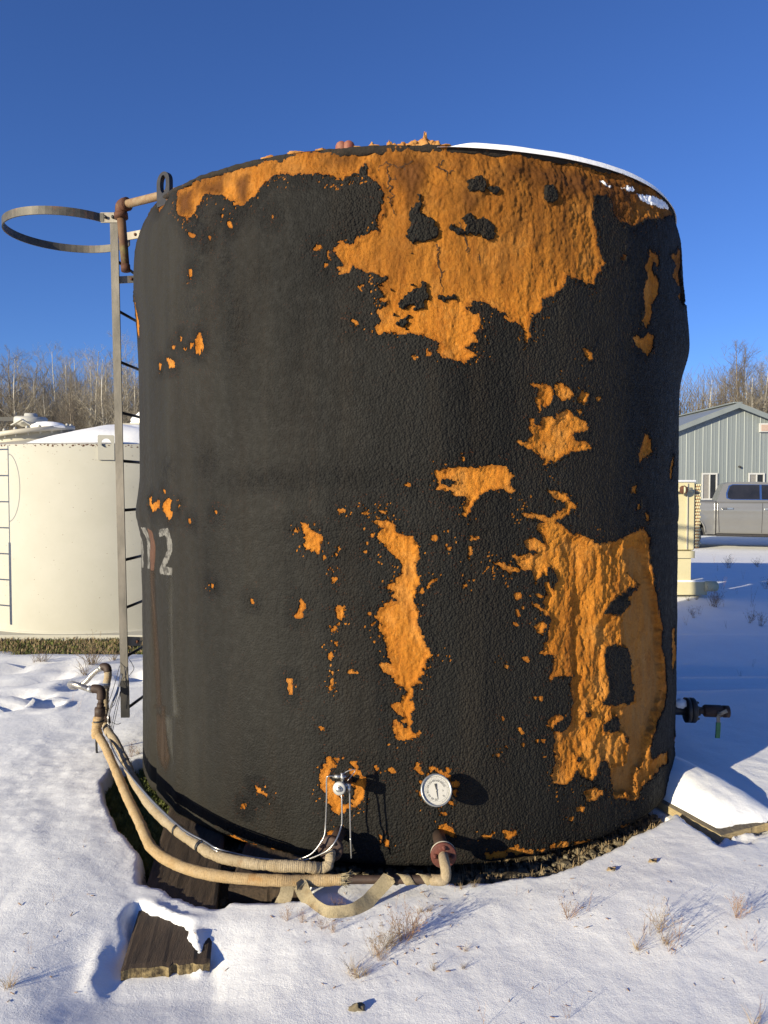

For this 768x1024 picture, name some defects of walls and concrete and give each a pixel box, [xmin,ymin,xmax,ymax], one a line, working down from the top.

peeling [159,145,672,365]
peeling [633,250,680,357]
peeling [159,332,204,374]
peeling [149,489,180,520]
peeling [291,522,341,584]
peeling [337,348,676,838]
peeling [321,605,359,696]
peeling [312,756,396,839]
peeling [476,829,590,860]